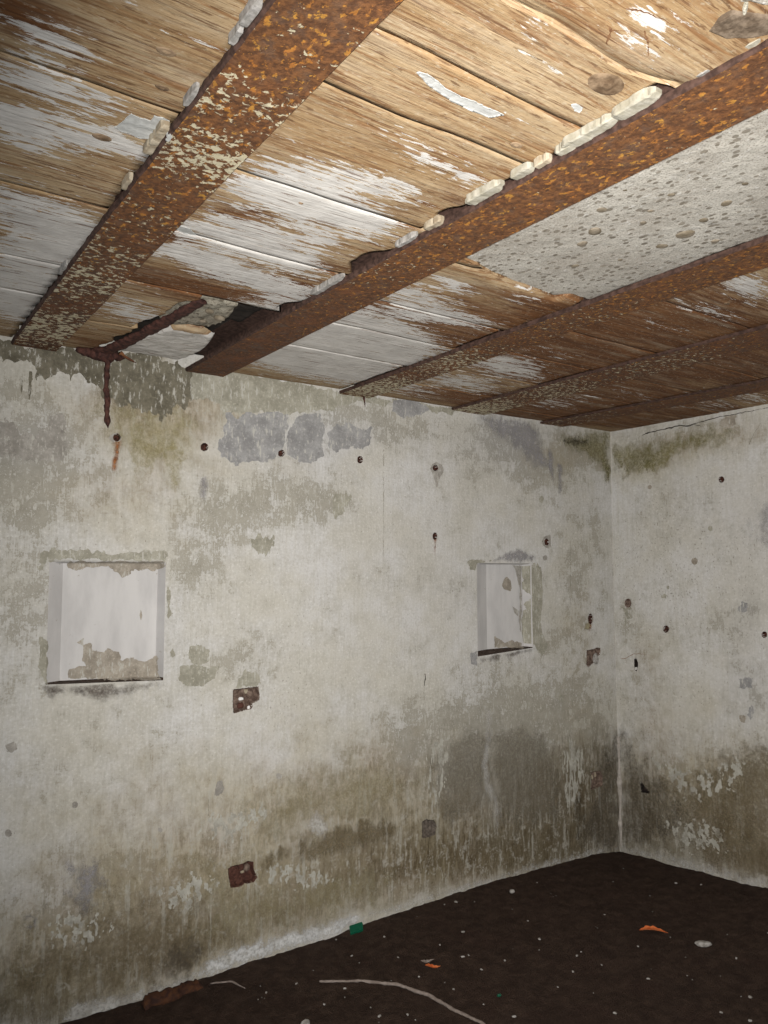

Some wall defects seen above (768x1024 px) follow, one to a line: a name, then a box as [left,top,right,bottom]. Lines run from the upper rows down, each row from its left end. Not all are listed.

peeling [114,113,172,142]
spalling [466,109,768,299]
spalling [159,295,238,327]
rust [75,299,207,428]
peeling [0,339,455,466]
peeling [68,638,219,687]
water stain [301,819,394,859]
water stain [577,736,623,858]
peeling [662,815,728,854]
water stain [659,747,768,876]
peeling [683,756,746,802]
water stain [66,916,359,1020]